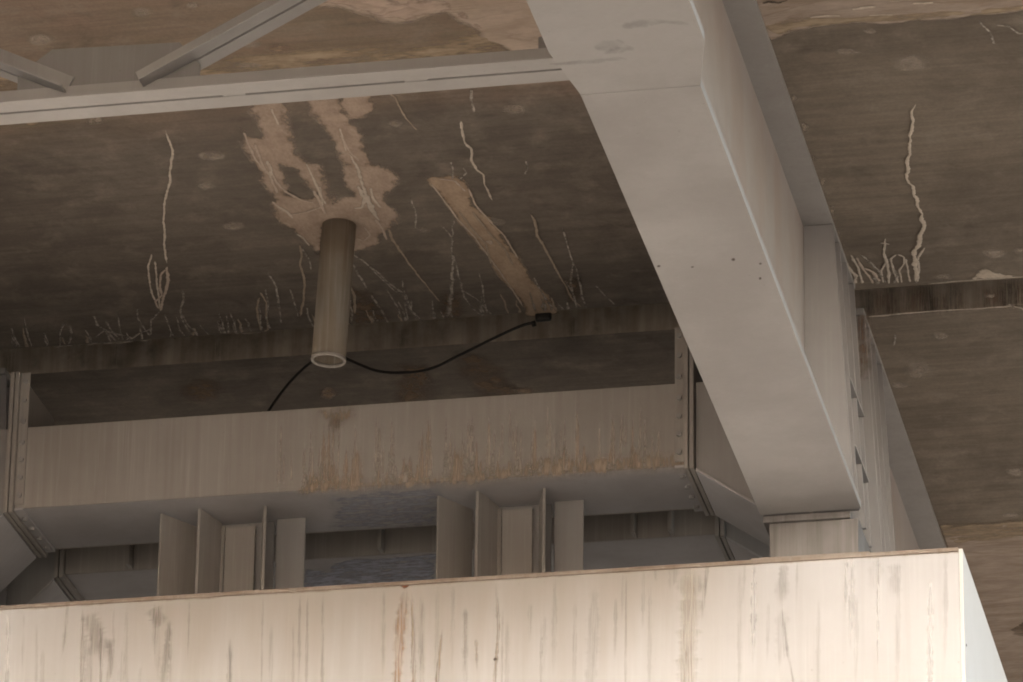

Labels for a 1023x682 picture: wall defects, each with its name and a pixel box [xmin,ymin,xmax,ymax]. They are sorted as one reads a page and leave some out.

crack [55,130,209,348]
crack [235,245,312,334]
crack [351,200,492,323]
crack [450,90,492,200]
crack [530,214,615,308]
crack [847,104,926,284]
crack [869,306,1023,317]